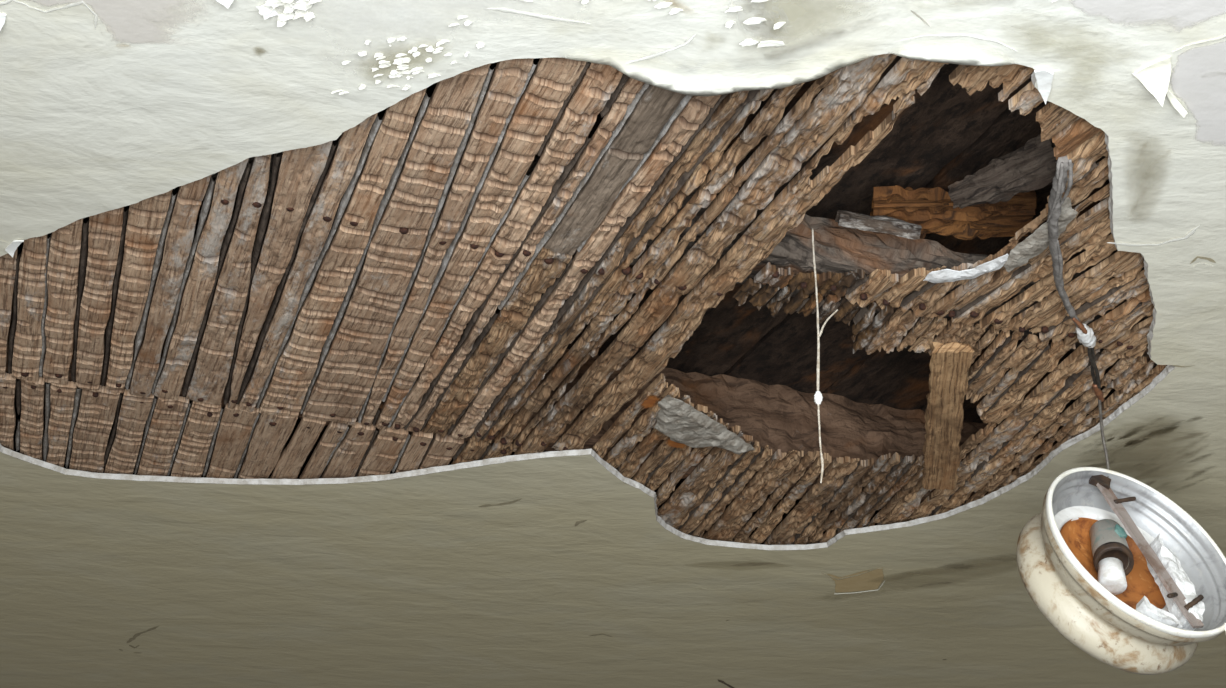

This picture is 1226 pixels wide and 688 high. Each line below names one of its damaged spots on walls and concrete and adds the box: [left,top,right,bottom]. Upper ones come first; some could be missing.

peeling [0,0,199,43]
leakage [648,0,683,15]
peeling [331,16,485,95]
flaking render [1031,68,1054,104]
peeling [1133,35,1226,145]
flaking render [5,240,24,257]
flaking render [0,365,1175,550]